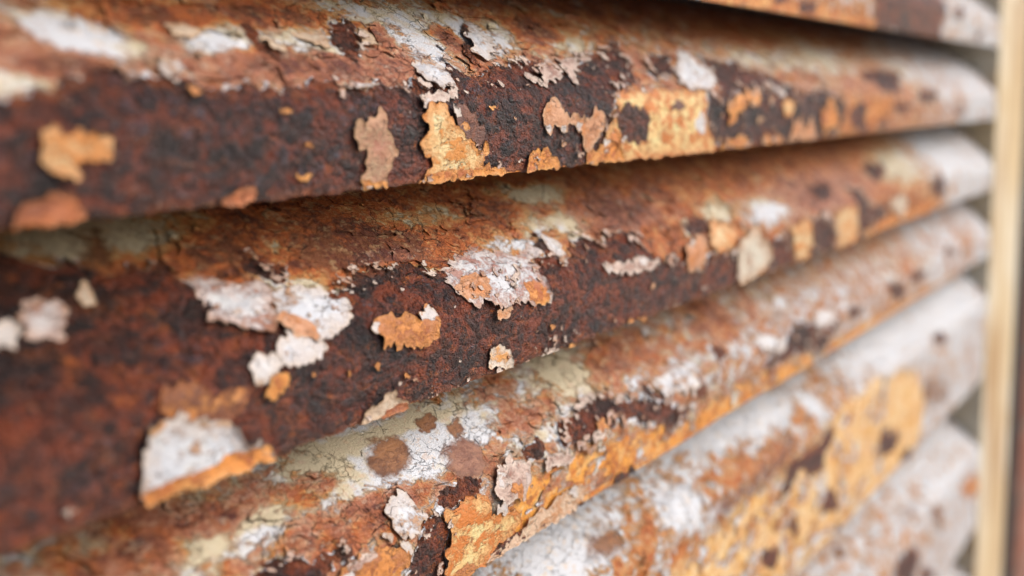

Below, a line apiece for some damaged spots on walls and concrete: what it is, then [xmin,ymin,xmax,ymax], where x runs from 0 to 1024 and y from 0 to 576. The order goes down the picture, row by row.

rust [319,13,371,63]
rust [706,0,965,38]
peeling [411,58,507,184]
peeling [524,50,717,173]
rust [694,52,938,151]
peeling [0,280,97,350]
rust [0,22,742,576]
peeling [371,303,441,352]
peeling [440,235,568,321]
rust [757,182,839,276]
peeling [140,273,354,508]
rust [493,269,958,576]